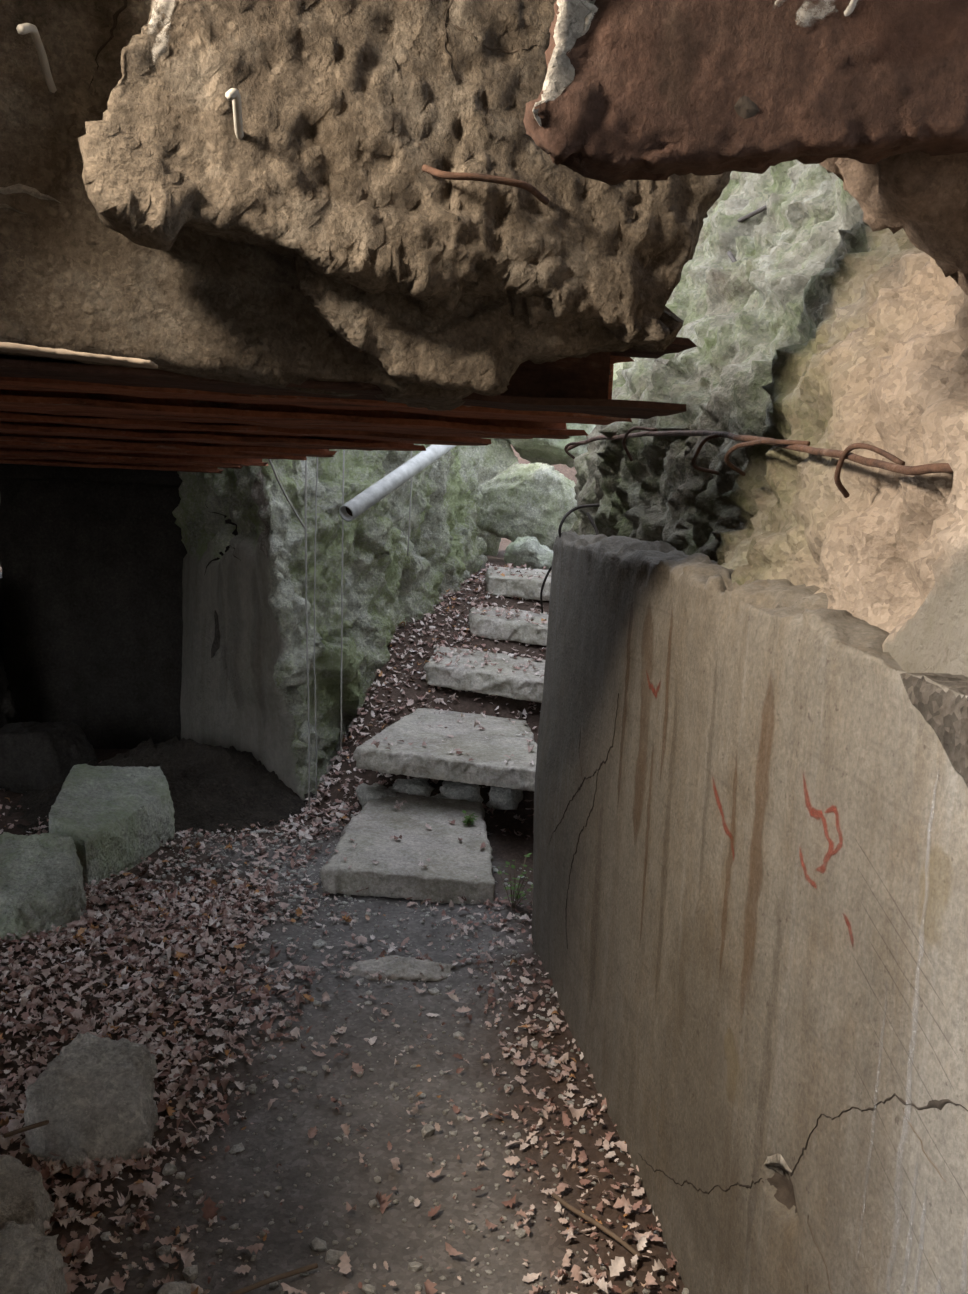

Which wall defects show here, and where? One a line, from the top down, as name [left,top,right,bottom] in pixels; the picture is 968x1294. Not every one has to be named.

crack [89,0,127,88]
spalling [532,0,598,126]
peeling [900,673,968,787]
crack [550,693,619,949]
crack [638,1093,968,1194]